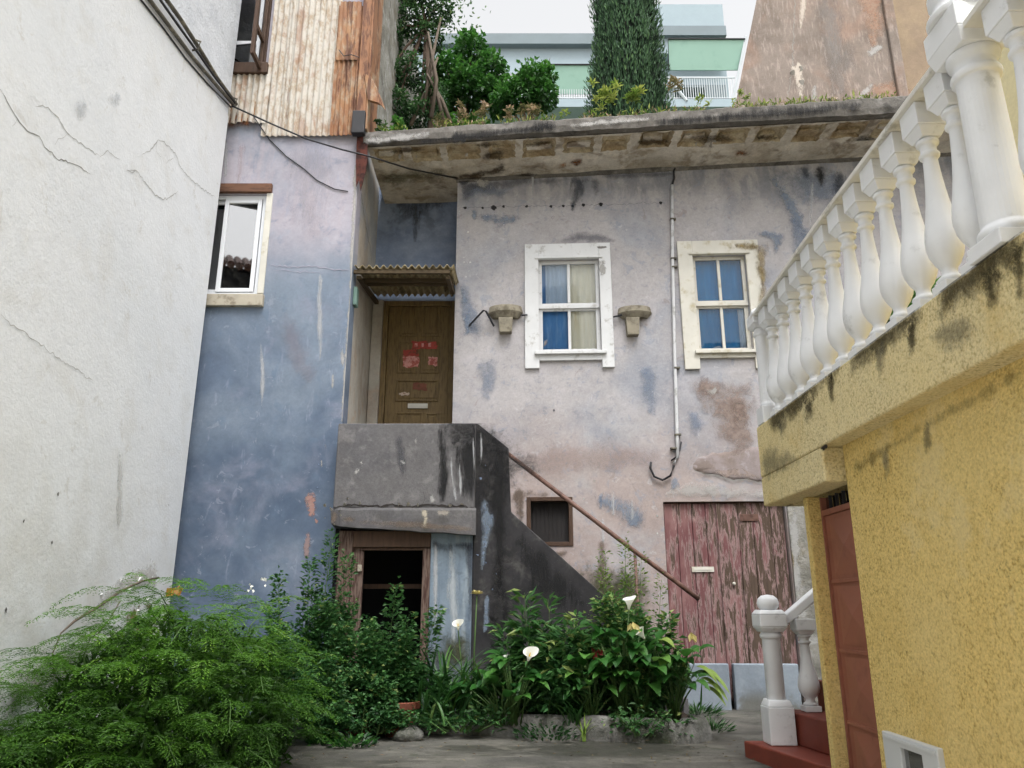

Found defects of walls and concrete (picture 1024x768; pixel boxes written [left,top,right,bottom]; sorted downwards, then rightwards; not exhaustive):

crack [3,94,212,200]
damp [454,151,504,180]
damp [940,236,1024,311]
crack [7,320,92,380]
damp [851,307,919,371]
damp [769,368,838,430]
damp [422,430,475,524]
damp [491,448,507,647]